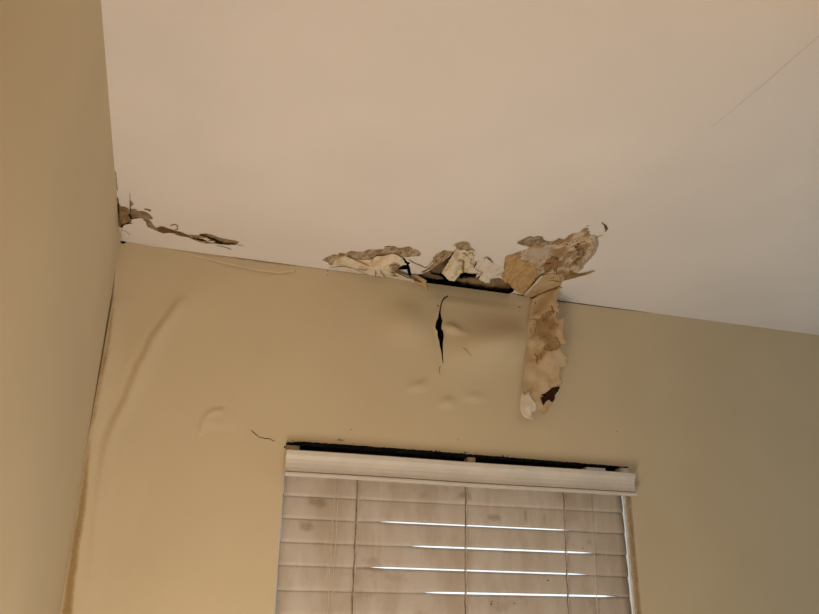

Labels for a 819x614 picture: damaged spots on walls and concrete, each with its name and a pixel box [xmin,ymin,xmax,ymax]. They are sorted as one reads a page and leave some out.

peeling [397,225,603,297]
crack [433,296,472,373]